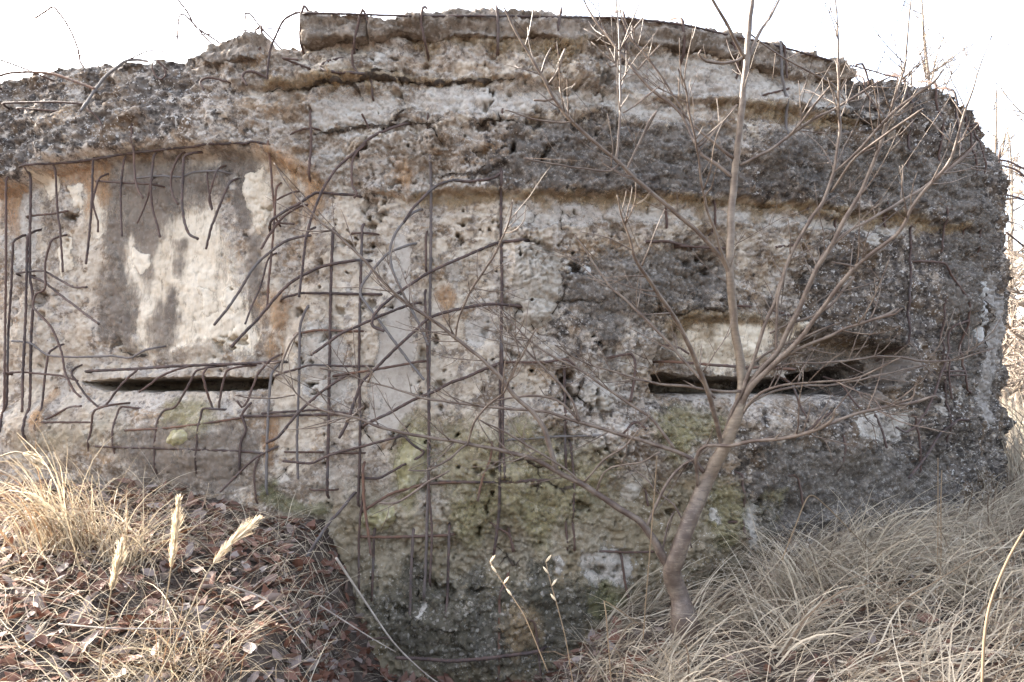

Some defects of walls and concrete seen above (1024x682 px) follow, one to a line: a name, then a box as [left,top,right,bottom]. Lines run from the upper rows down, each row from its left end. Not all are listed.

spalling [305,43,861,163]
rust [0,179,29,230]
rust [48,163,110,214]
flaking render [242,167,273,235]
rust [257,145,326,216]
flaking render [9,163,260,356]
damp [98,151,262,351]
flaking render [294,317,354,404]
flaking render [367,227,420,436]
flaking render [464,316,499,351]
damp [364,493,611,682]